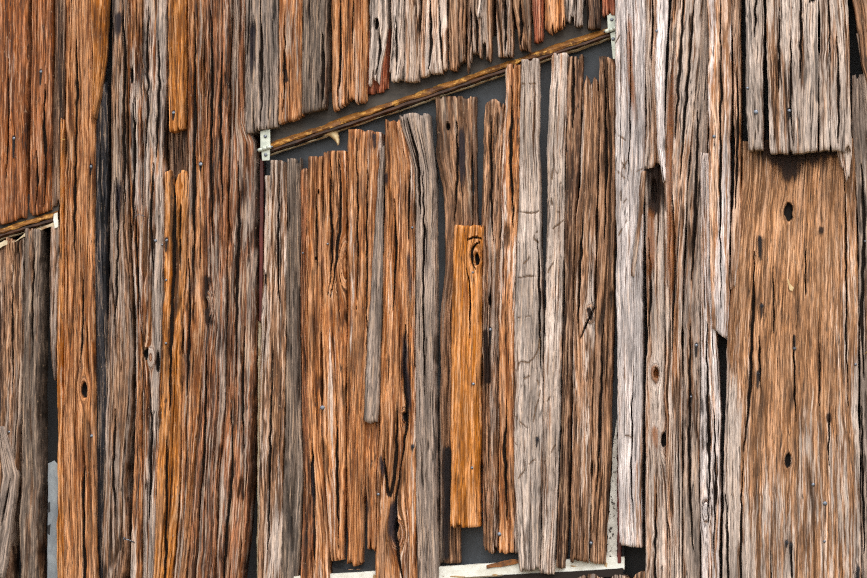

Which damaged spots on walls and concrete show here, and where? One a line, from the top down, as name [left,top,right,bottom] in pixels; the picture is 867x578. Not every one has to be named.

crack [384,120,426,578]
crack [467,0,654,517]